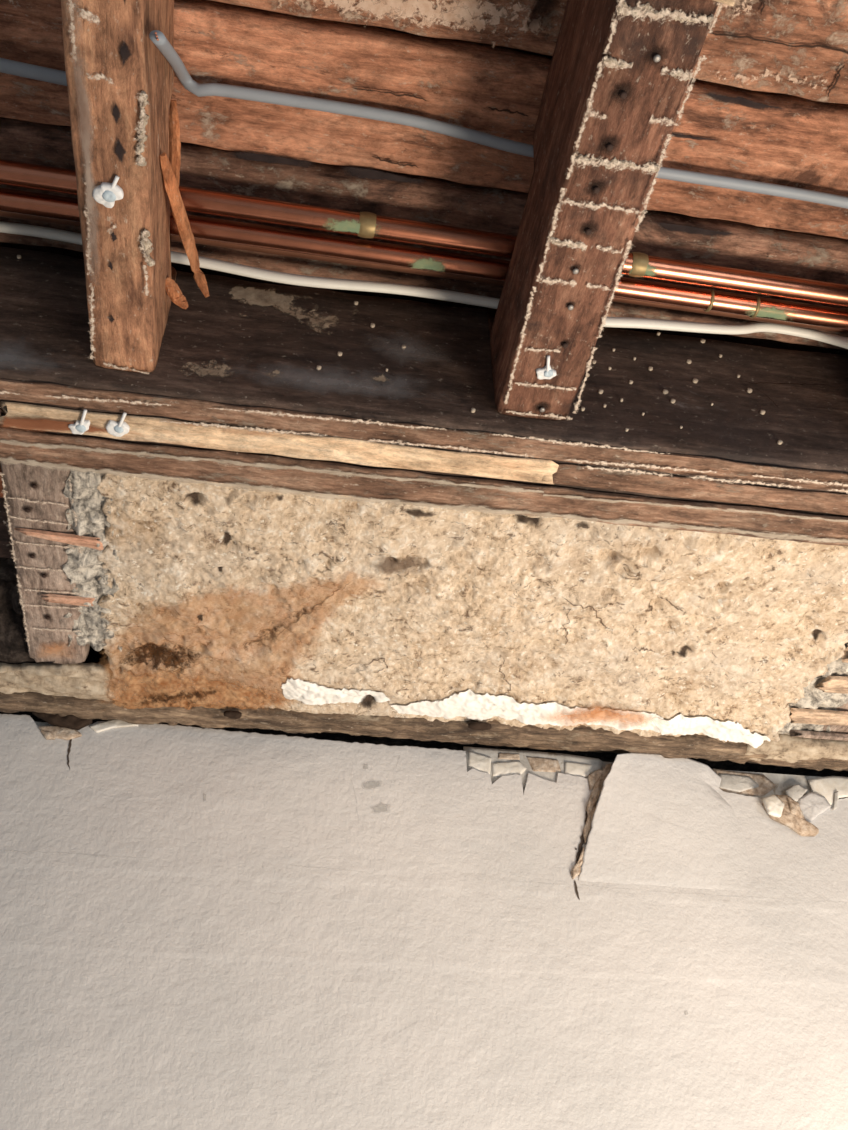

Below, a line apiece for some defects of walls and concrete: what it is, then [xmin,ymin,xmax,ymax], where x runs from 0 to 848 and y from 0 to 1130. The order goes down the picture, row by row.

leakage [111,642,285,710]
spalling [463,747,603,788]
crack [571,764,612,900]
peeling [712,769,848,837]